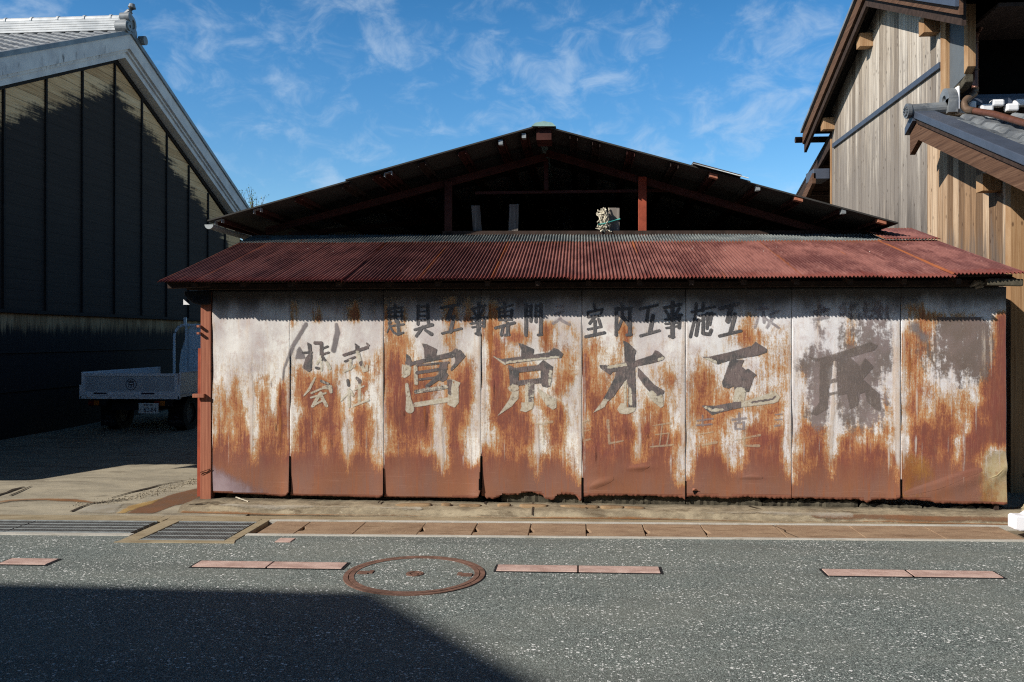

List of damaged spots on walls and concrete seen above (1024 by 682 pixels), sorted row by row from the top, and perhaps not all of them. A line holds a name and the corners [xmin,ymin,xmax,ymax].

rust [213,297,1007,502]